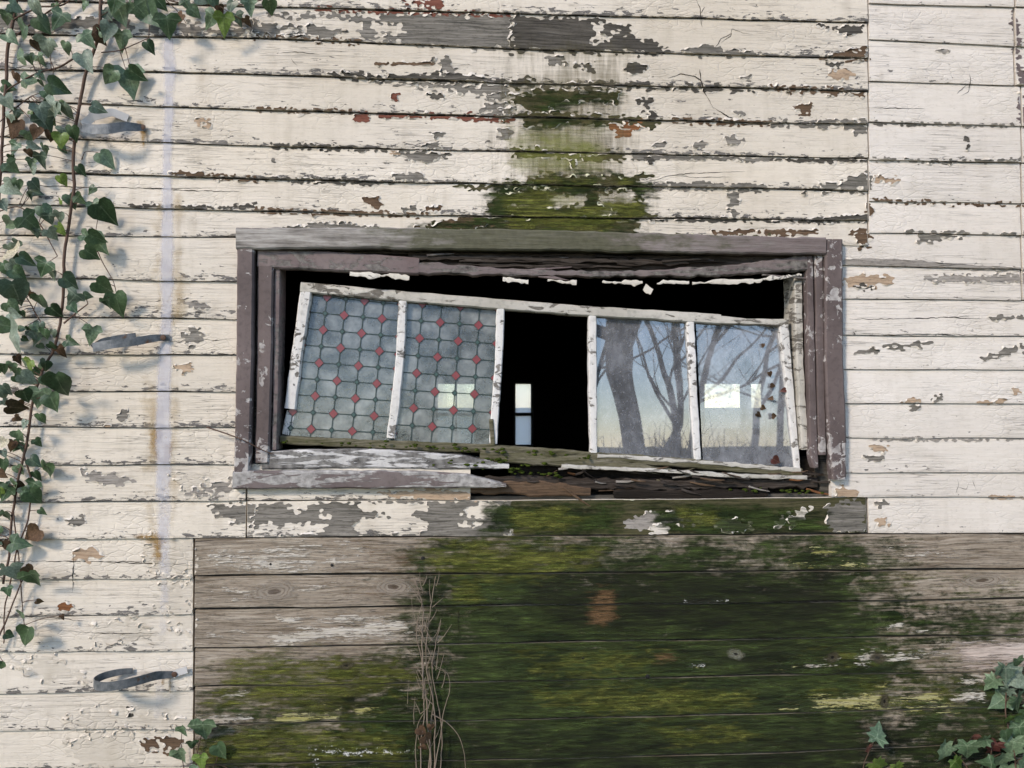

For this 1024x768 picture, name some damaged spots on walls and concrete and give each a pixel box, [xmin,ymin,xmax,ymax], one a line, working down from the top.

crack [670,73,733,119]
peeling [0,0,1024,295]
damp [524,78,623,199]
peeling [853,340,934,355]
peeling [979,342,1024,362]
peeling [167,470,511,568]
damp [643,500,831,534]
peeling [88,531,246,651]
peeling [61,704,193,768]
damp [197,724,402,767]
damp [534,685,755,747]
damp [855,650,1024,768]